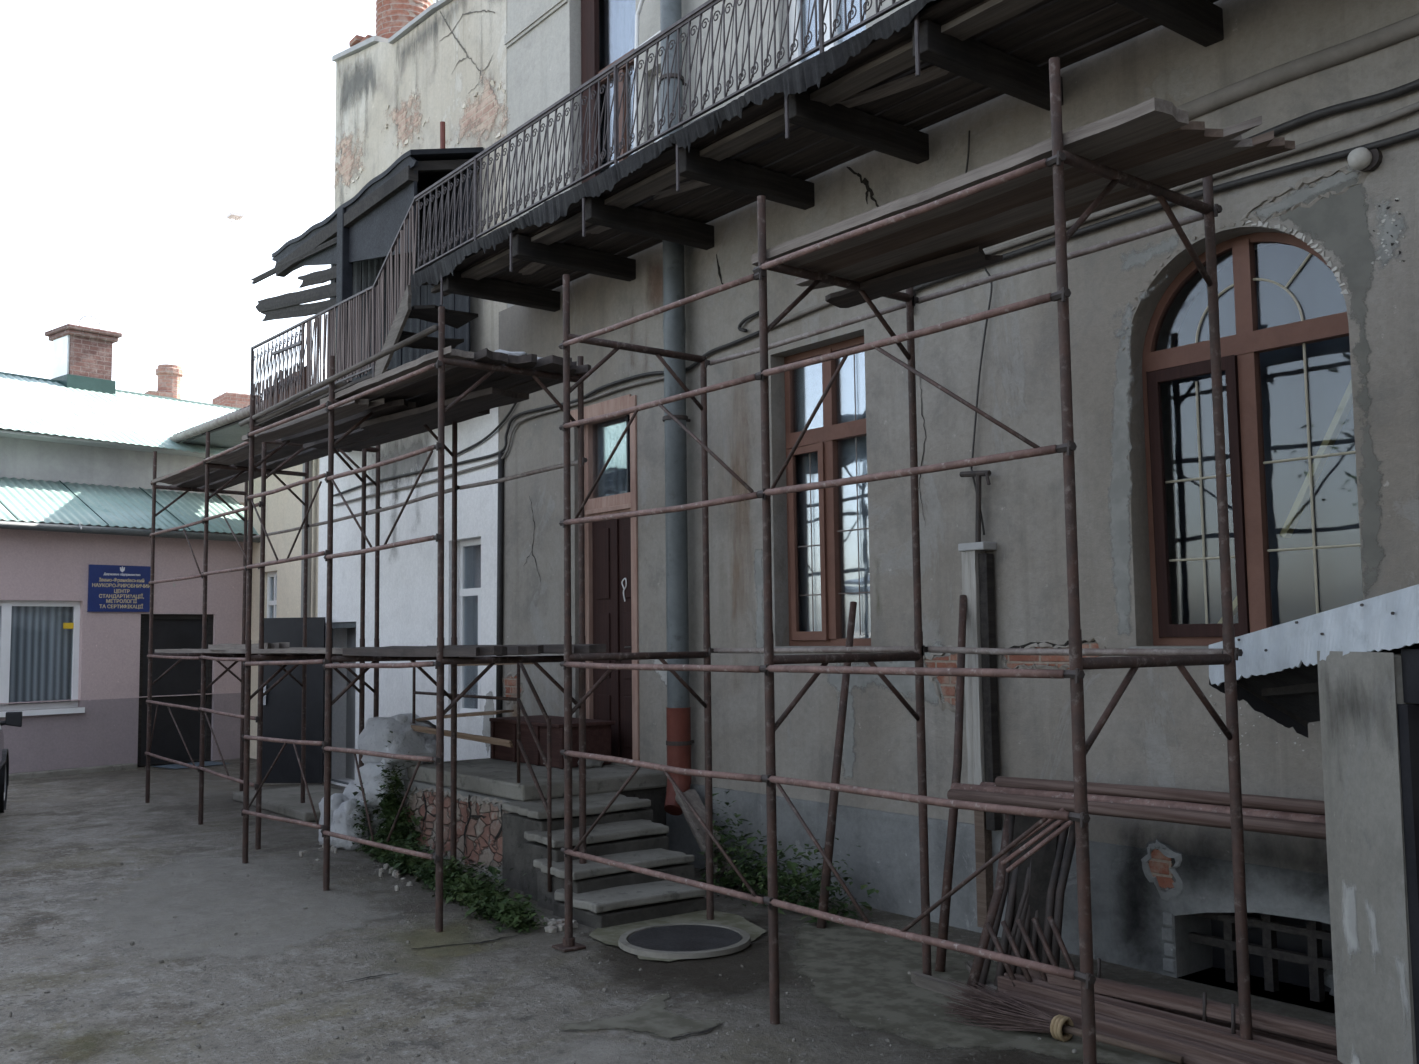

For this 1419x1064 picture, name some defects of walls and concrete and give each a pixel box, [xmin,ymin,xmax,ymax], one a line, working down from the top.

crack [440,10,495,93]
flaking render [386,89,429,153]
flaking render [445,74,508,147]
flaking render [334,132,364,188]
crack [847,167,879,207]
flaking render [923,645,957,713]
flaking render [997,635,1110,671]
flaking render [1141,838,1184,902]